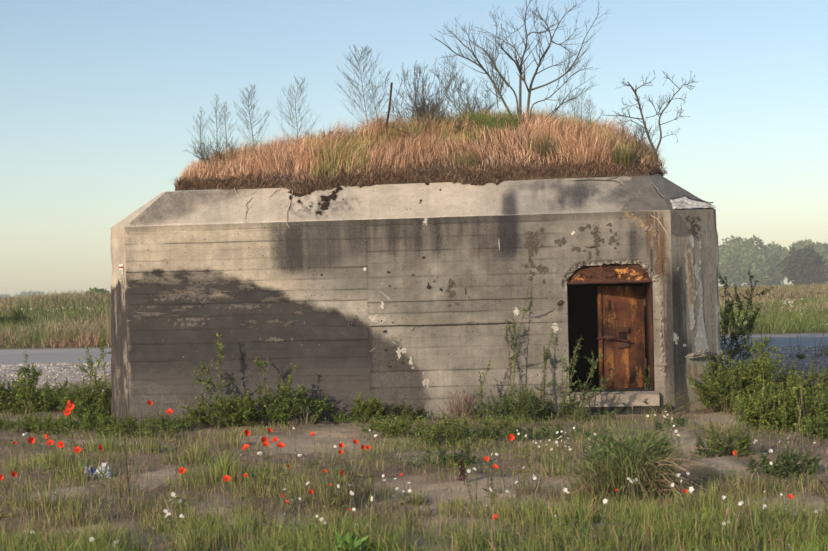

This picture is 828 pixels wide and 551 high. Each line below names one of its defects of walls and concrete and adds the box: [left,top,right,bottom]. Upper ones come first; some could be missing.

damp [273,195,518,269]
peeling [523,228,548,284]
peeling [554,223,656,284]
corrosion [615,267,645,280]
corrosion [624,212,665,279]
spalling [670,195,716,237]
damp [111,269,423,424]